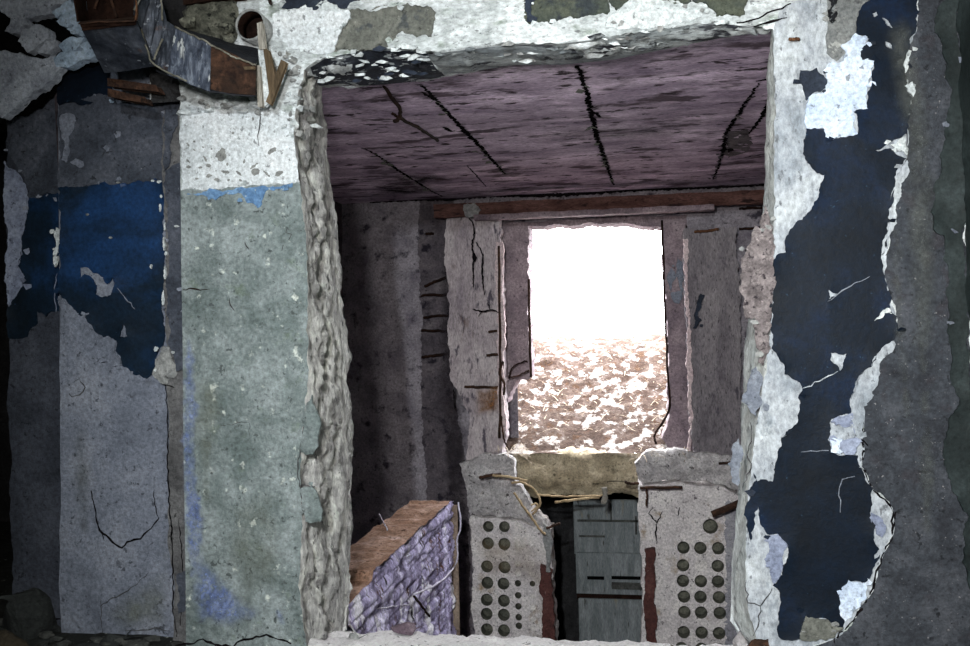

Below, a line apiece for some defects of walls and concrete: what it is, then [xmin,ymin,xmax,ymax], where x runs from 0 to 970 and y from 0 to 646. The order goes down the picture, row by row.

peeling [0,0,293,379]
spalling [272,0,758,142]
crack [362,66,767,317]
peeling [624,0,920,646]
peeling [931,0,970,589]
crack [91,384,291,646]